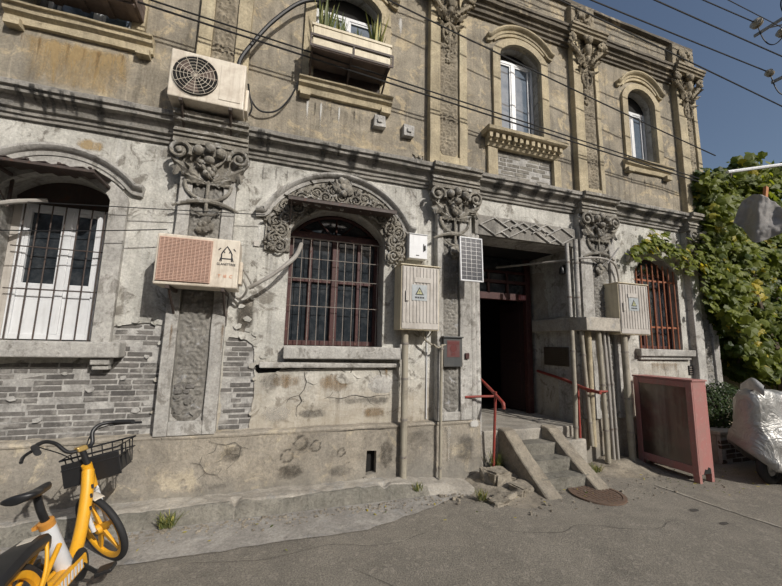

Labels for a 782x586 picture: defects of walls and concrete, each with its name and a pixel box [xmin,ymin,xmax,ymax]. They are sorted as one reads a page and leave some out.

water stain [14,84,78,115]
water stain [95,99,105,125]
flaking render [0,317,163,440]
flaking render [218,295,281,430]
crack [265,366,401,417]
water stain [280,435,321,476]